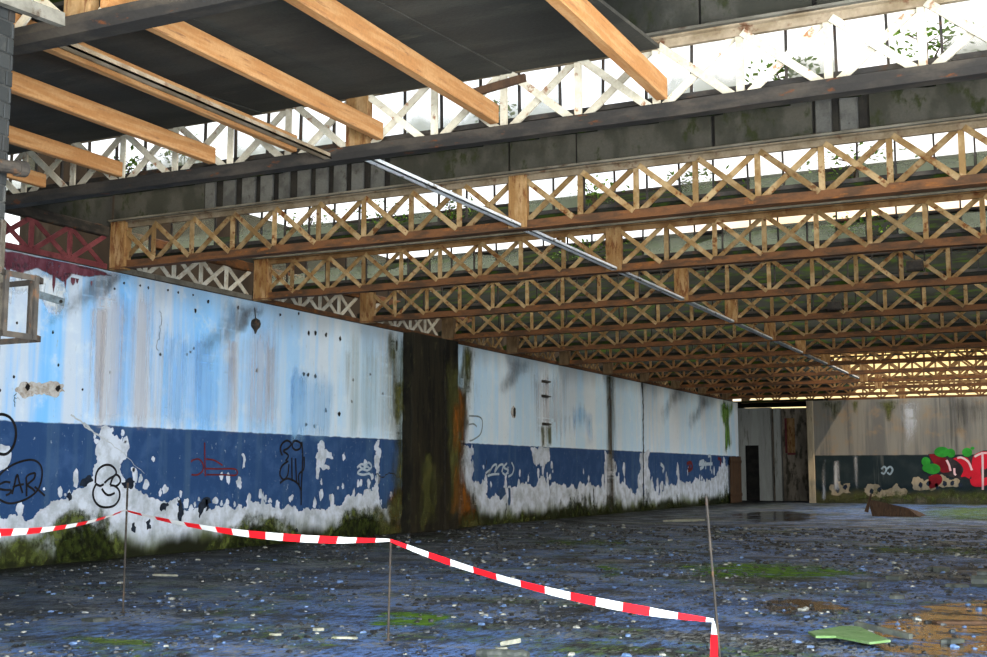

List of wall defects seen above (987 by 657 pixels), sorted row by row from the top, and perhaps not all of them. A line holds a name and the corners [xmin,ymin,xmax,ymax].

damp [6,265,79,312]
flaking render [13,375,65,399]
peeling [0,425,401,567]
rust [449,369,478,525]
peeling [458,444,730,527]